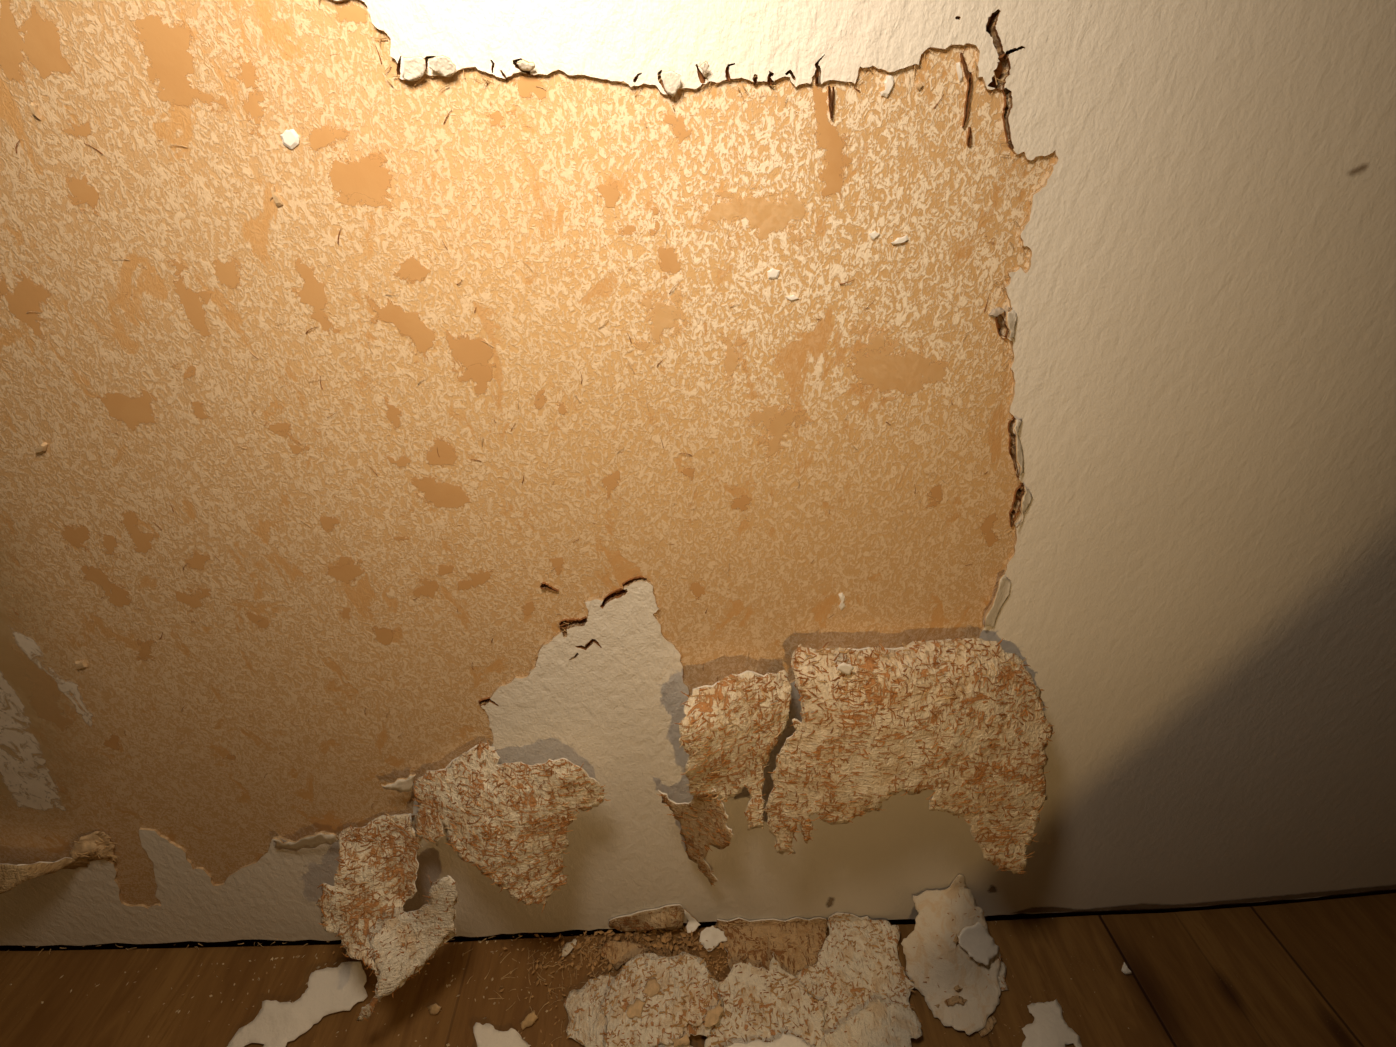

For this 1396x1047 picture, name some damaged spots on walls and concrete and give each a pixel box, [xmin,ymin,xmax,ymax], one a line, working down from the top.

peeling [0,0,1056,1021]
crack [986,9,1025,150]